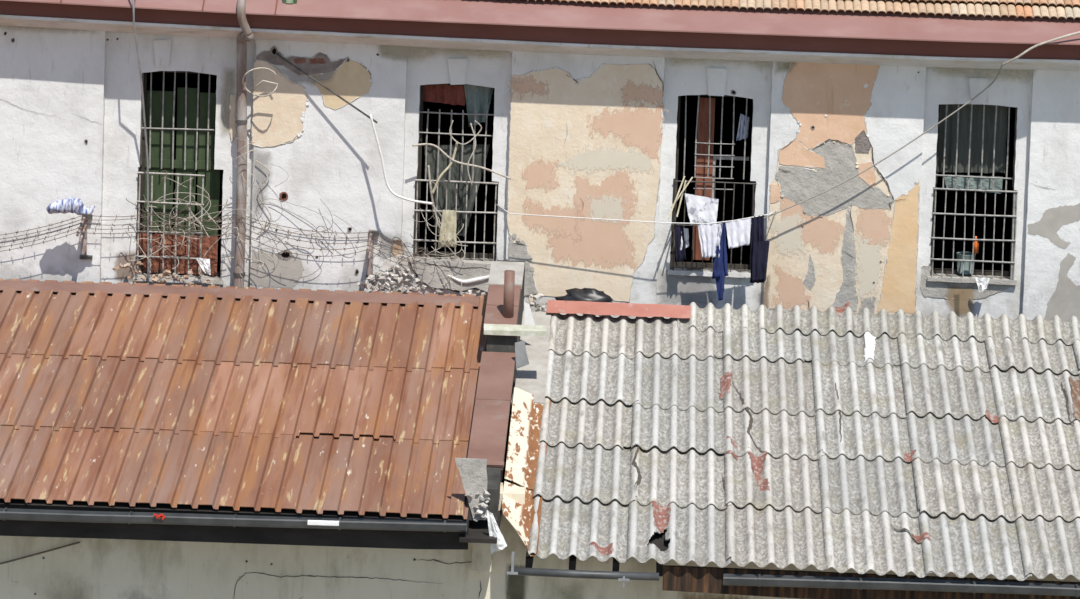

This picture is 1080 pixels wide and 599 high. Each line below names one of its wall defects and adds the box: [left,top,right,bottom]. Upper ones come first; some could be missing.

peeling [251,46,373,148]
peeling [506,63,664,303]
peeling [764,62,1014,316]
spalling [374,239,488,296]
rust [0,254,488,520]
spalling [464,489,490,522]
water stain [507,566,525,599]